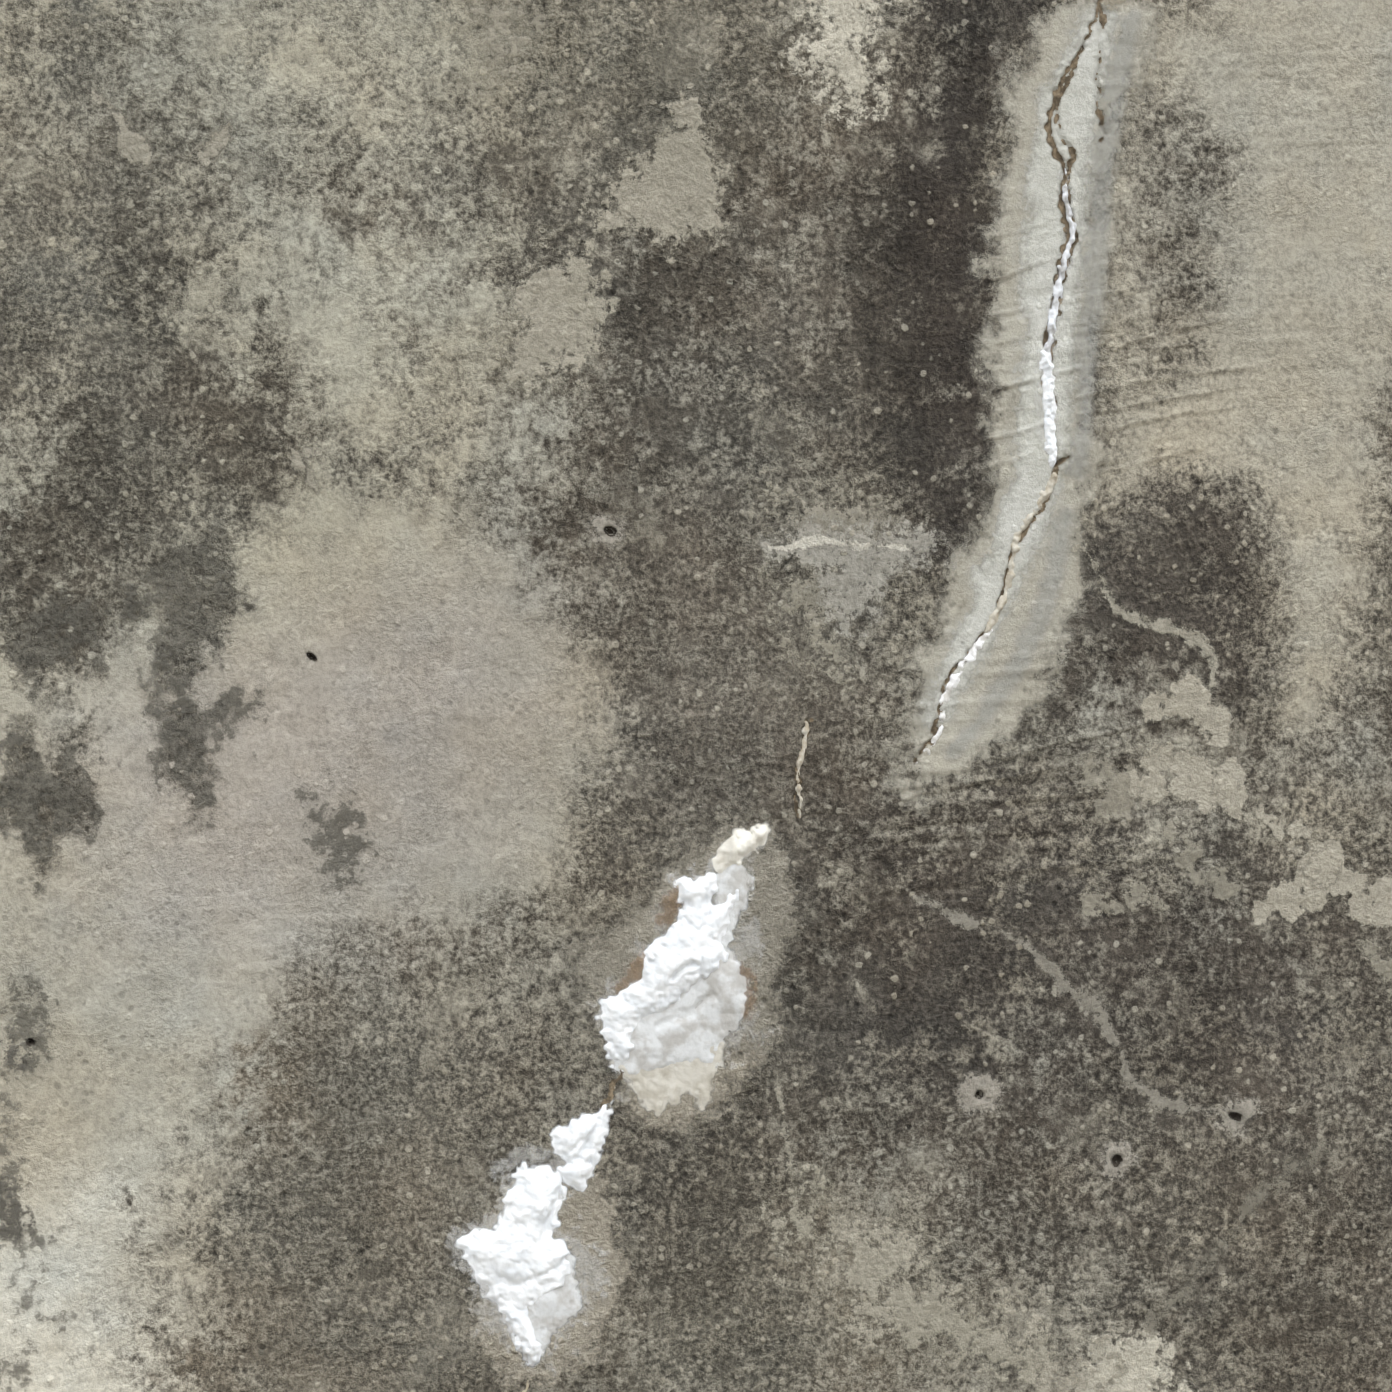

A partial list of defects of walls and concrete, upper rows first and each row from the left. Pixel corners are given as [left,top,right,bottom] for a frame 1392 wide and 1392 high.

crack [913,0,1107,764]
crack [794,718,814,818]
crack [600,1070,624,1109]
water stain [455,806,806,1389]